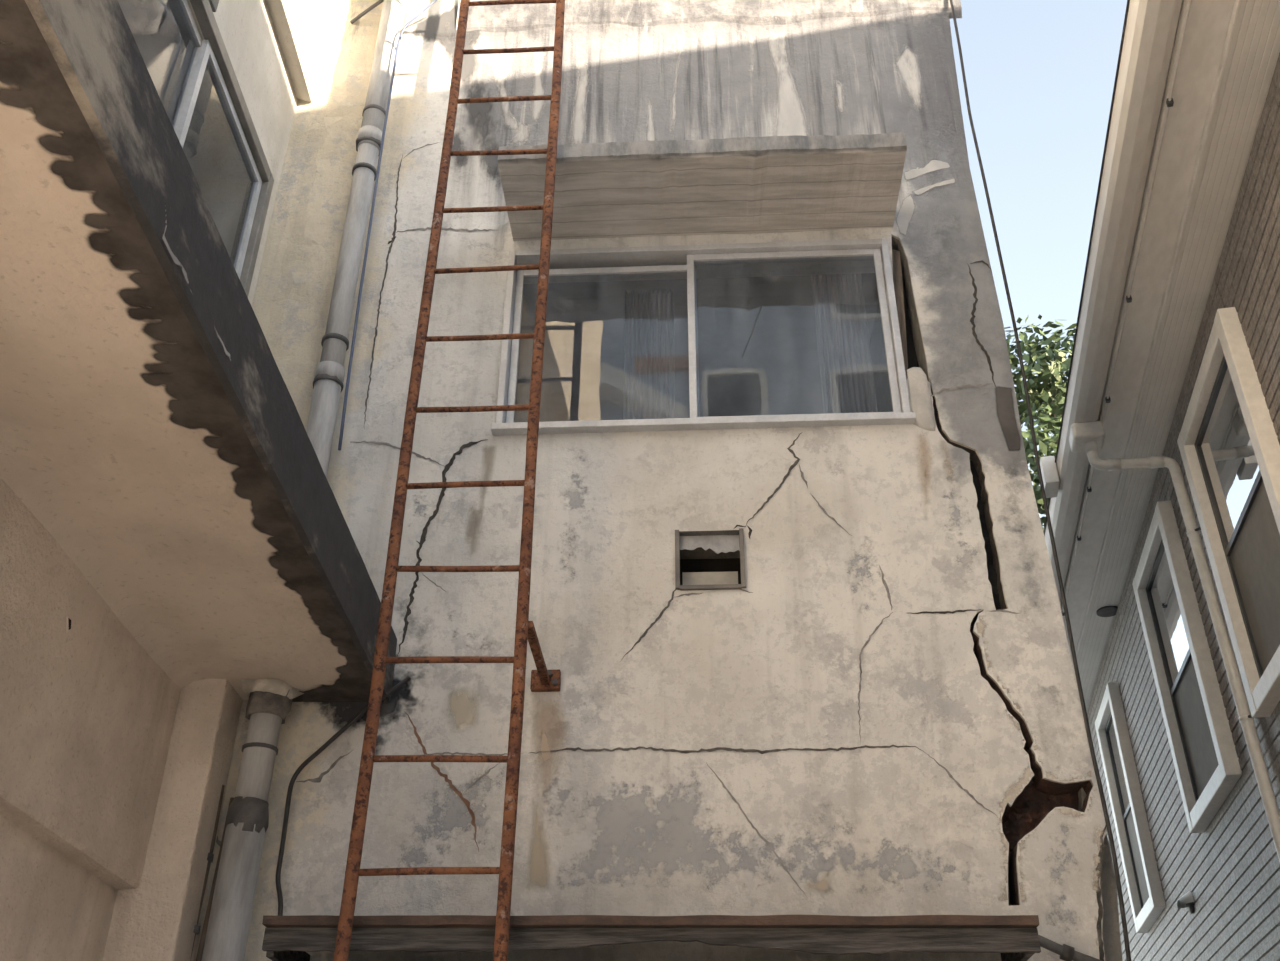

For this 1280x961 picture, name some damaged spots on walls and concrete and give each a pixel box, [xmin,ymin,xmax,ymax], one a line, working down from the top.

damp [415,5,544,184]
damp [573,63,588,144]
damp [647,105,655,141]
damp [769,33,807,136]
damp [897,48,920,103]
damp [0,0,415,753]
crack [354,142,492,656]
crack [404,260,1019,898]
peeling [572,784,968,887]